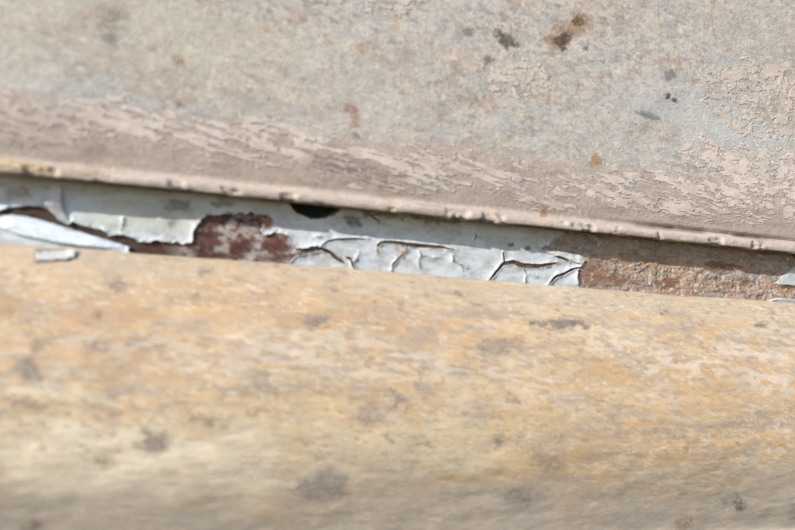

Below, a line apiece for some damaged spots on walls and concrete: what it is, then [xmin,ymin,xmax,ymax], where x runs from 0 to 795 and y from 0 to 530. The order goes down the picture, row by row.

peeling [0,54,795,225]
peeling [0,184,321,264]
rust [188,214,321,261]
crack [316,212,463,269]
crack [489,252,580,285]
rust [706,261,740,272]